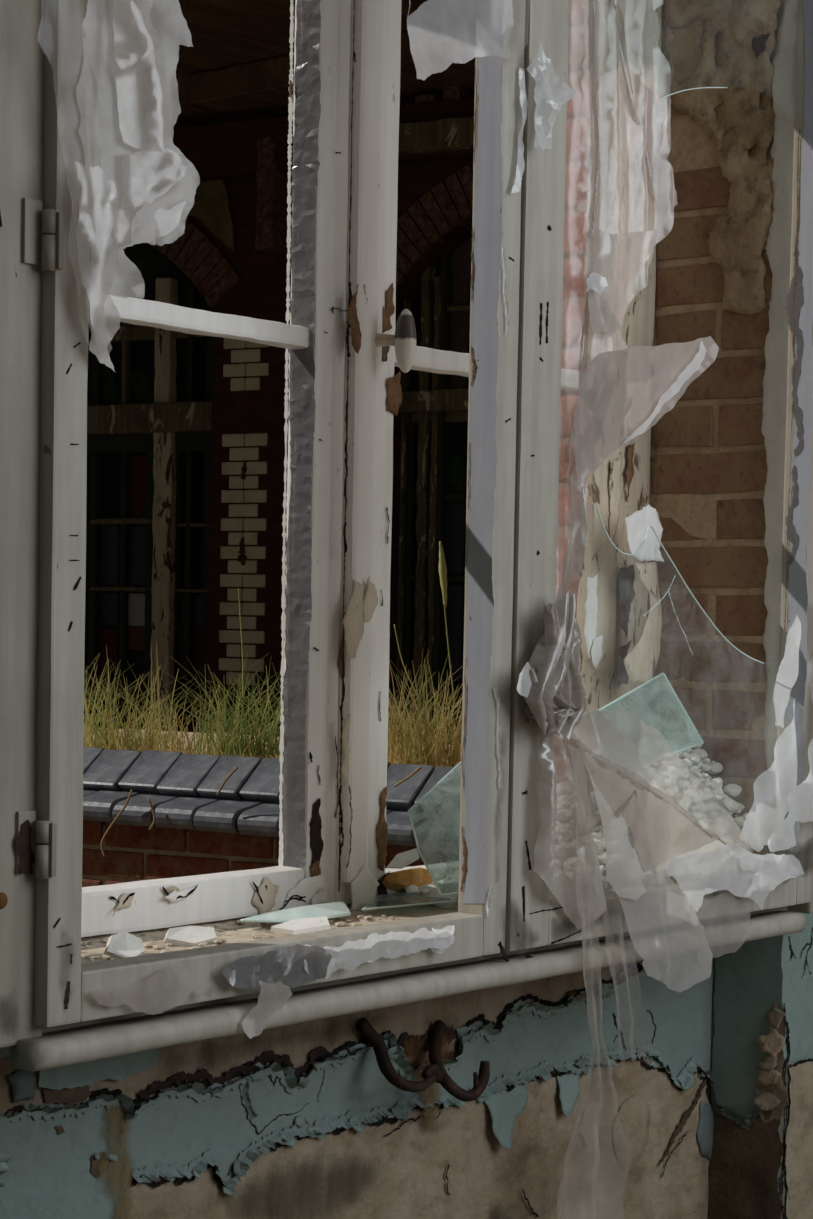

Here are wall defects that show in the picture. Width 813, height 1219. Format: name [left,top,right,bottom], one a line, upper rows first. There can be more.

peeling [347,284,362,354]
peeling [381,283,395,362]
peeling [386,371,403,416]
peeling [338,576,378,678]
peeling [252,798,330,935]
spalling [0,961,646,1135]
spalling [127,1001,813,1219]
spalling [91,1152,117,1177]